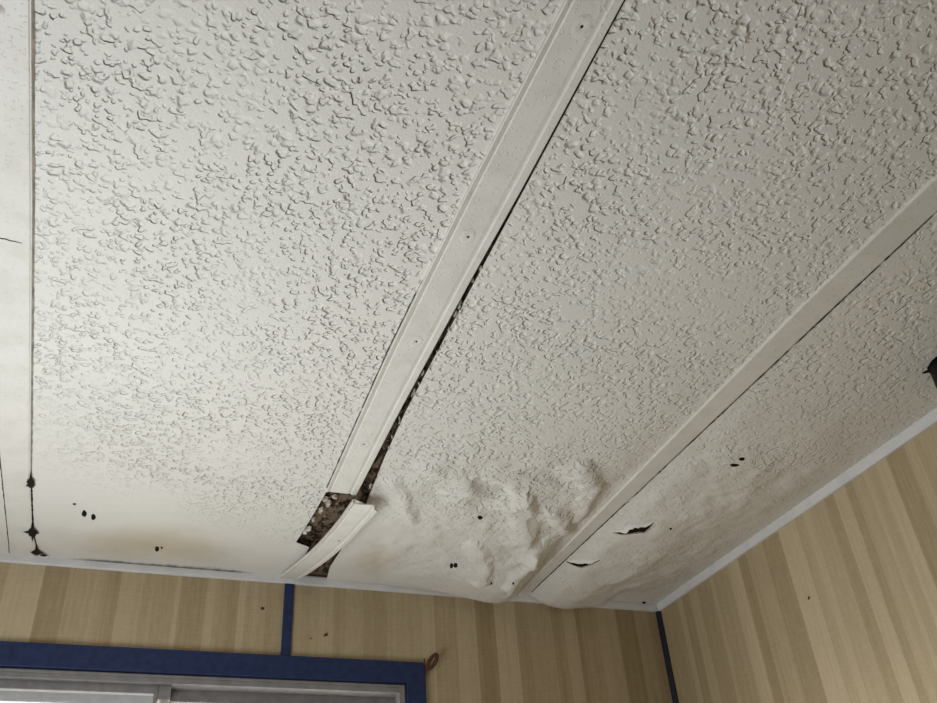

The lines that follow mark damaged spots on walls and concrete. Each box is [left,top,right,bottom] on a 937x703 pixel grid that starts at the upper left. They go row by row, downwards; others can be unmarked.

crack [613,522,654,535]
water stain [24,524,48,557]
crack [566,559,600,569]